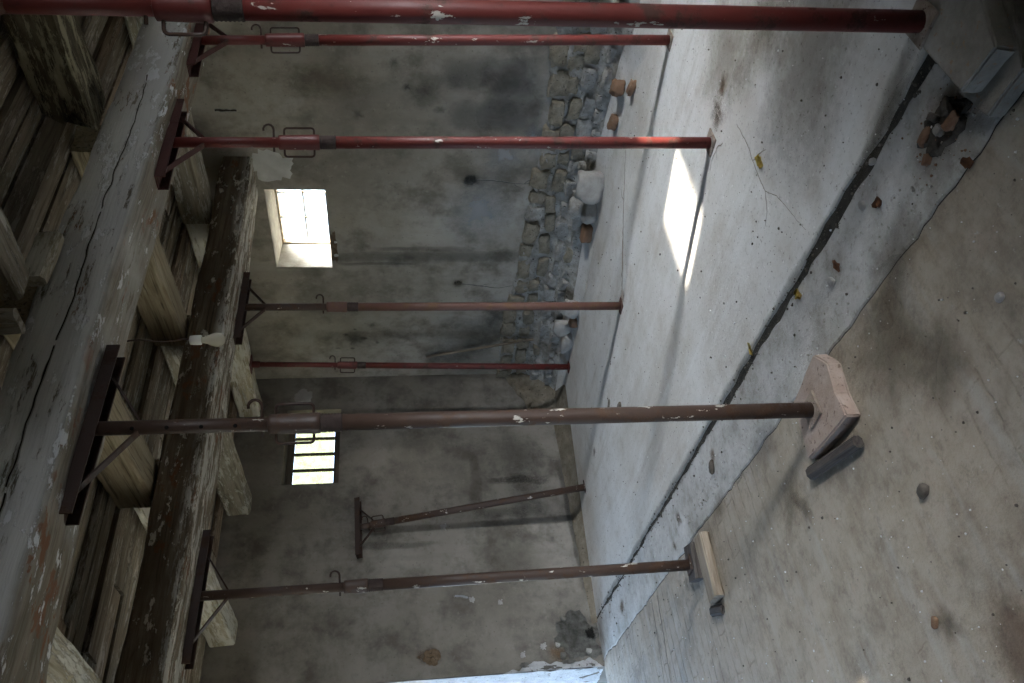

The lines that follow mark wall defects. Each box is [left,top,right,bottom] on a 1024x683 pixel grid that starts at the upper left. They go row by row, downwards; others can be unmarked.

crack [0,74,148,517]
flaking render [496,27,634,409]
crack [710,124,806,230]
flaking render [541,610,602,670]